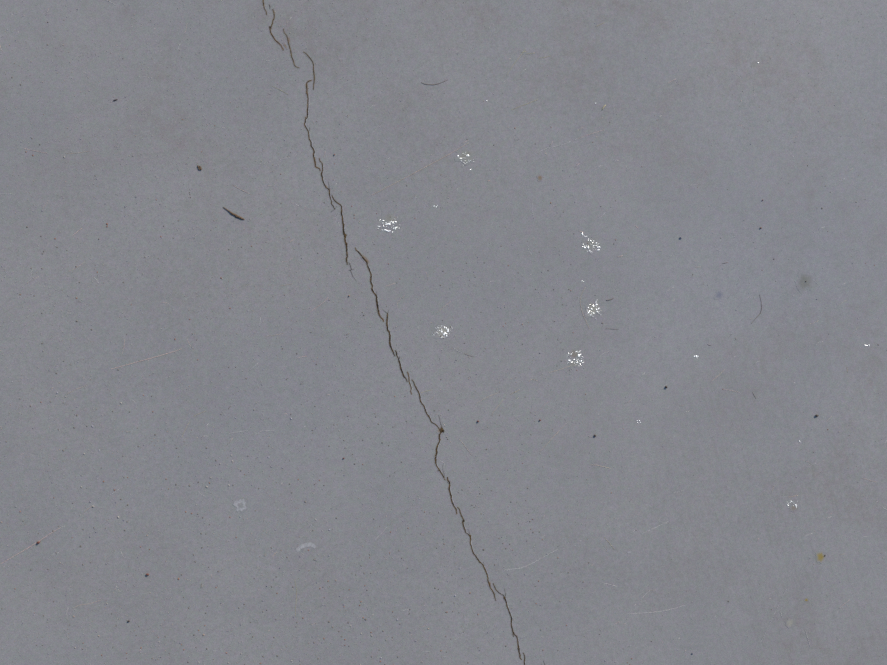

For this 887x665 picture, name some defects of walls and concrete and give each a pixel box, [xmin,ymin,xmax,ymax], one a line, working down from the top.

crack [262,0,545,665]